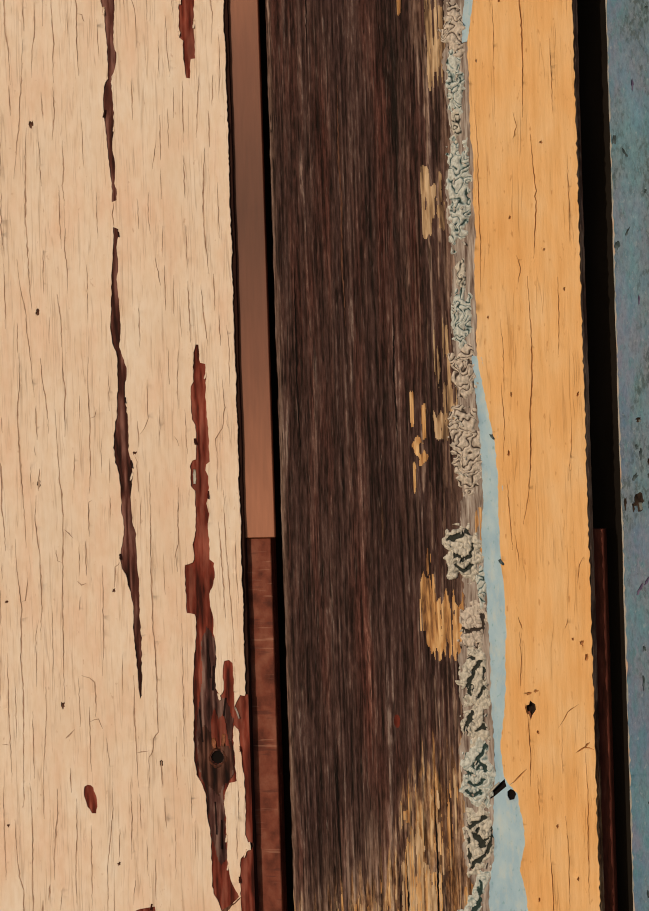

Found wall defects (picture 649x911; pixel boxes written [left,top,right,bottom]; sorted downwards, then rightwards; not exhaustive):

peeling [178,0,195,78]
peeling [101,0,117,202]
crack [0,0,239,911]
peeling [110,227,142,698]
water stain [433,410,455,441]
peeling [185,345,255,911]
peeling [84,785,97,813]
water stain [395,792,452,911]
water stain [453,768,466,840]